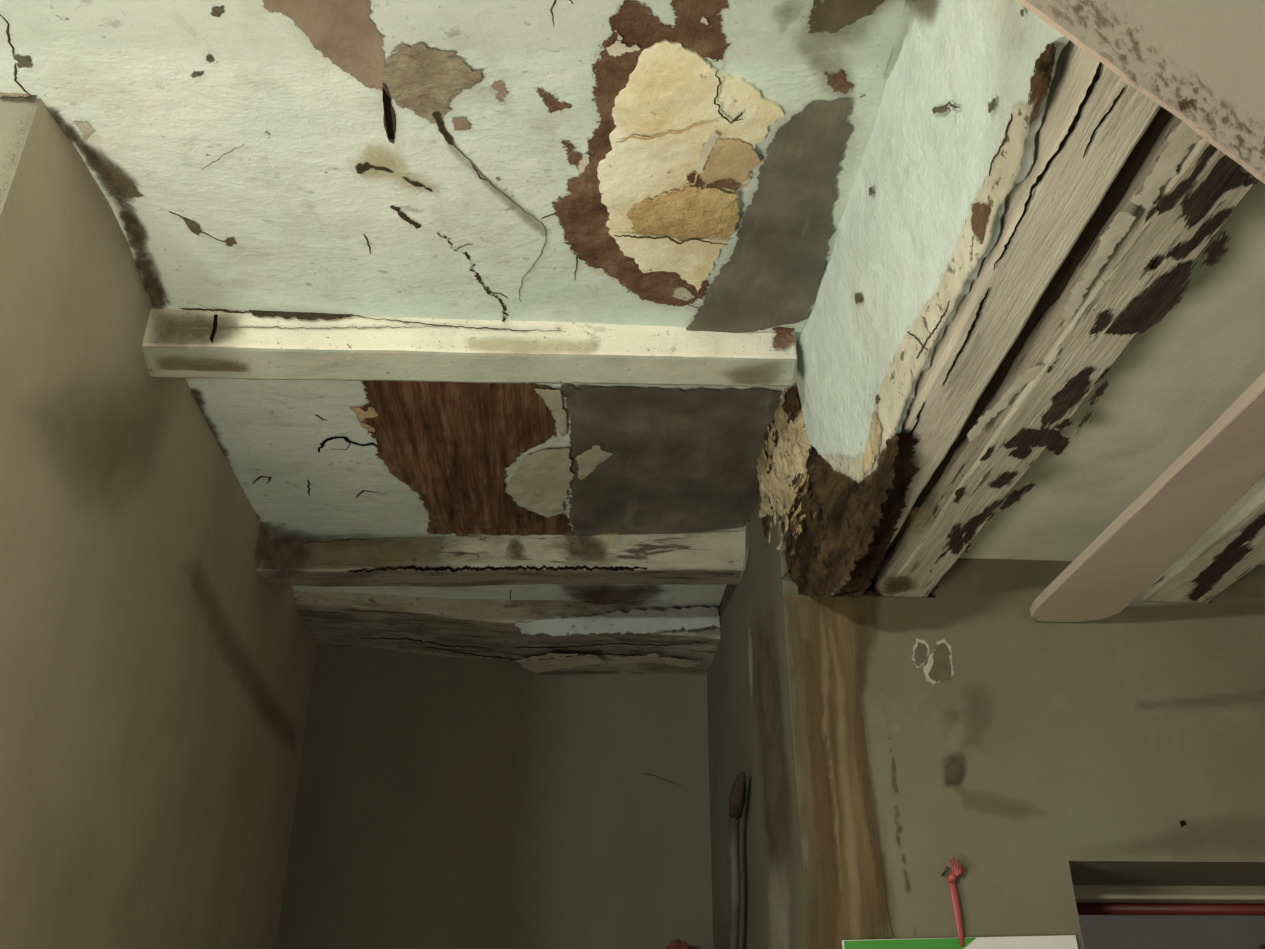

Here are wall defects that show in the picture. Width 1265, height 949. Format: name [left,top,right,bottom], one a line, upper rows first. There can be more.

crack [0,15,32,96]
peeling [262,0,396,144]
crack [151,107,566,332]
flaking render [552,0,730,308]
crack [825,62,1125,482]
flaking render [971,201,991,244]
flaking render [1025,43,1058,129]
peeling [1053,0,1265,349]
crack [315,414,383,452]
flaking render [505,388,575,518]
flaking render [726,327,811,547]
peeling [918,366,1111,598]